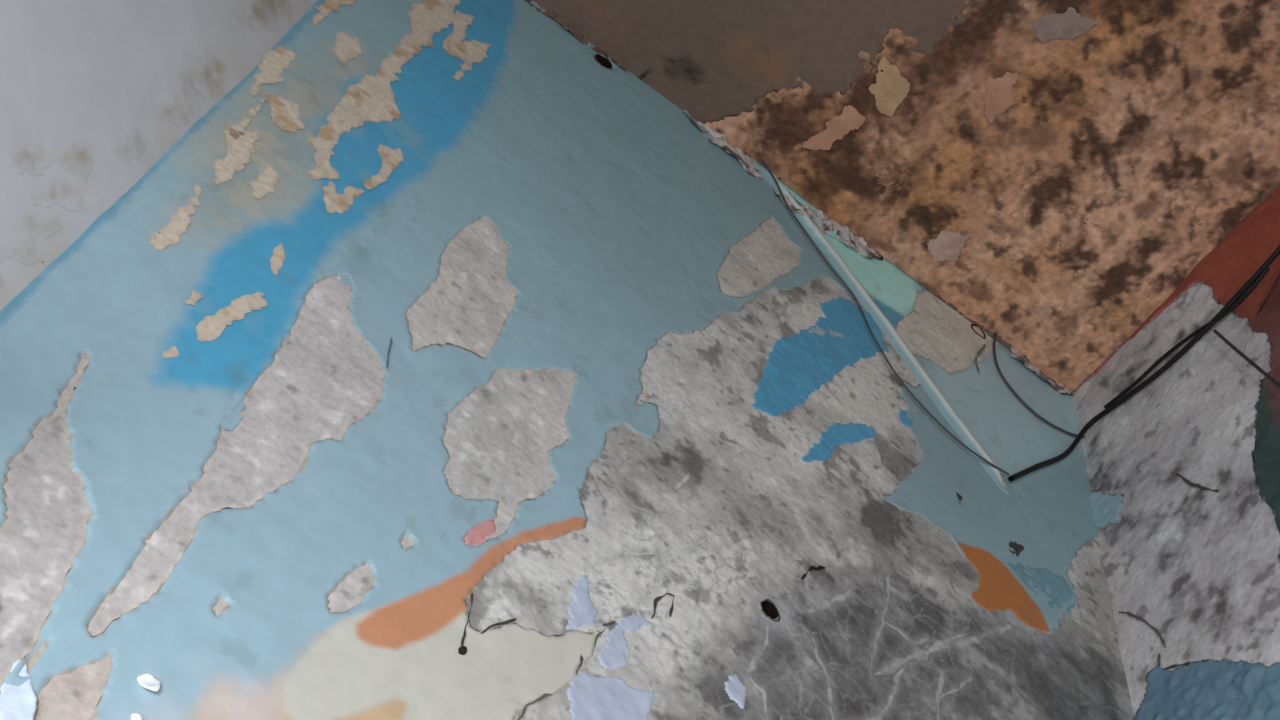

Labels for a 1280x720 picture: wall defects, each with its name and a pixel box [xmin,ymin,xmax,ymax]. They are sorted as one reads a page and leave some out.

peeling [149,0,491,250]
peeling [0,352,112,720]
peeling [88,276,384,636]
peeling [270,243,286,275]
peeling [406,216,518,358]
peeling [443,368,574,547]
flaking render [466,0,1280,720]
peeling [137,673,161,692]